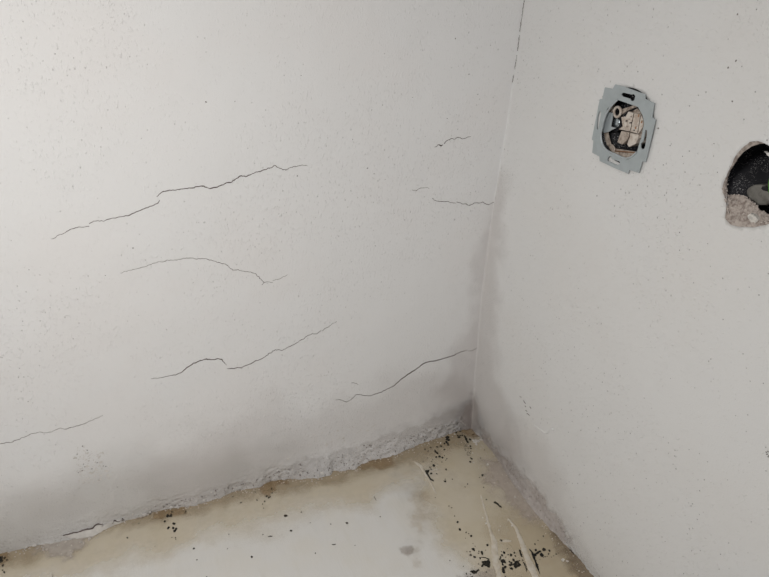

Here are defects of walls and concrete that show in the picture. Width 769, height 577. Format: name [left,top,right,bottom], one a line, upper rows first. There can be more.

crack [53,165,307,239]
crack [153,321,337,379]
crack [338,349,475,402]
damp [0,416,594,577]